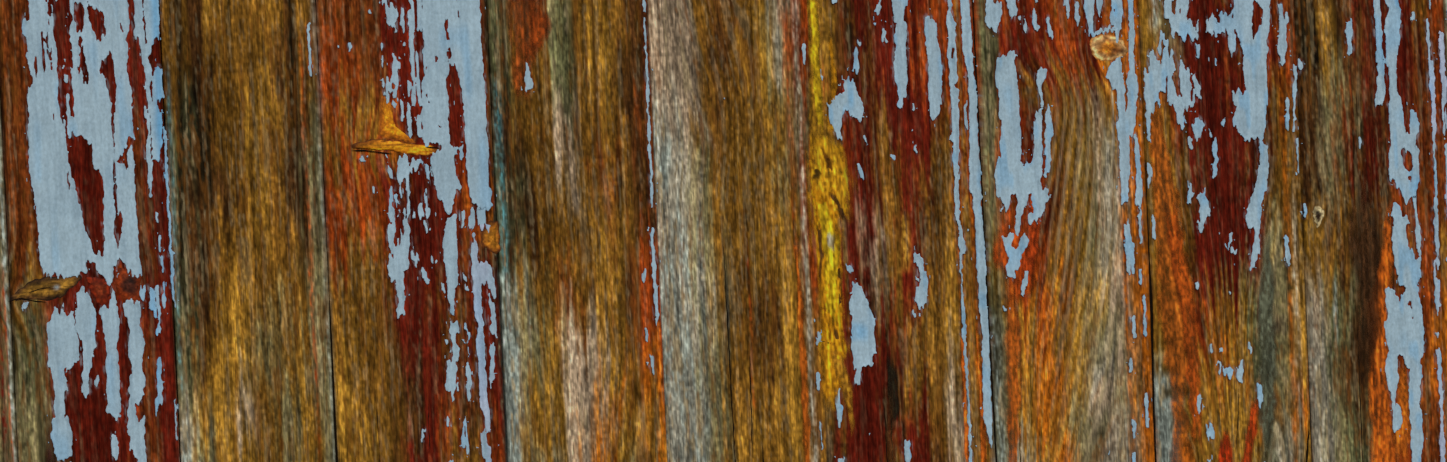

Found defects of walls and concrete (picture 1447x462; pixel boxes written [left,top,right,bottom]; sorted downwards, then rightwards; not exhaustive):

peeling [22,0,179,462]
peeling [368,0,499,462]
peeling [802,39,868,145]
peeling [819,265,877,462]
peeling [873,0,1303,462]
peeling [1344,18,1353,58]
peeling [1373,0,1447,462]